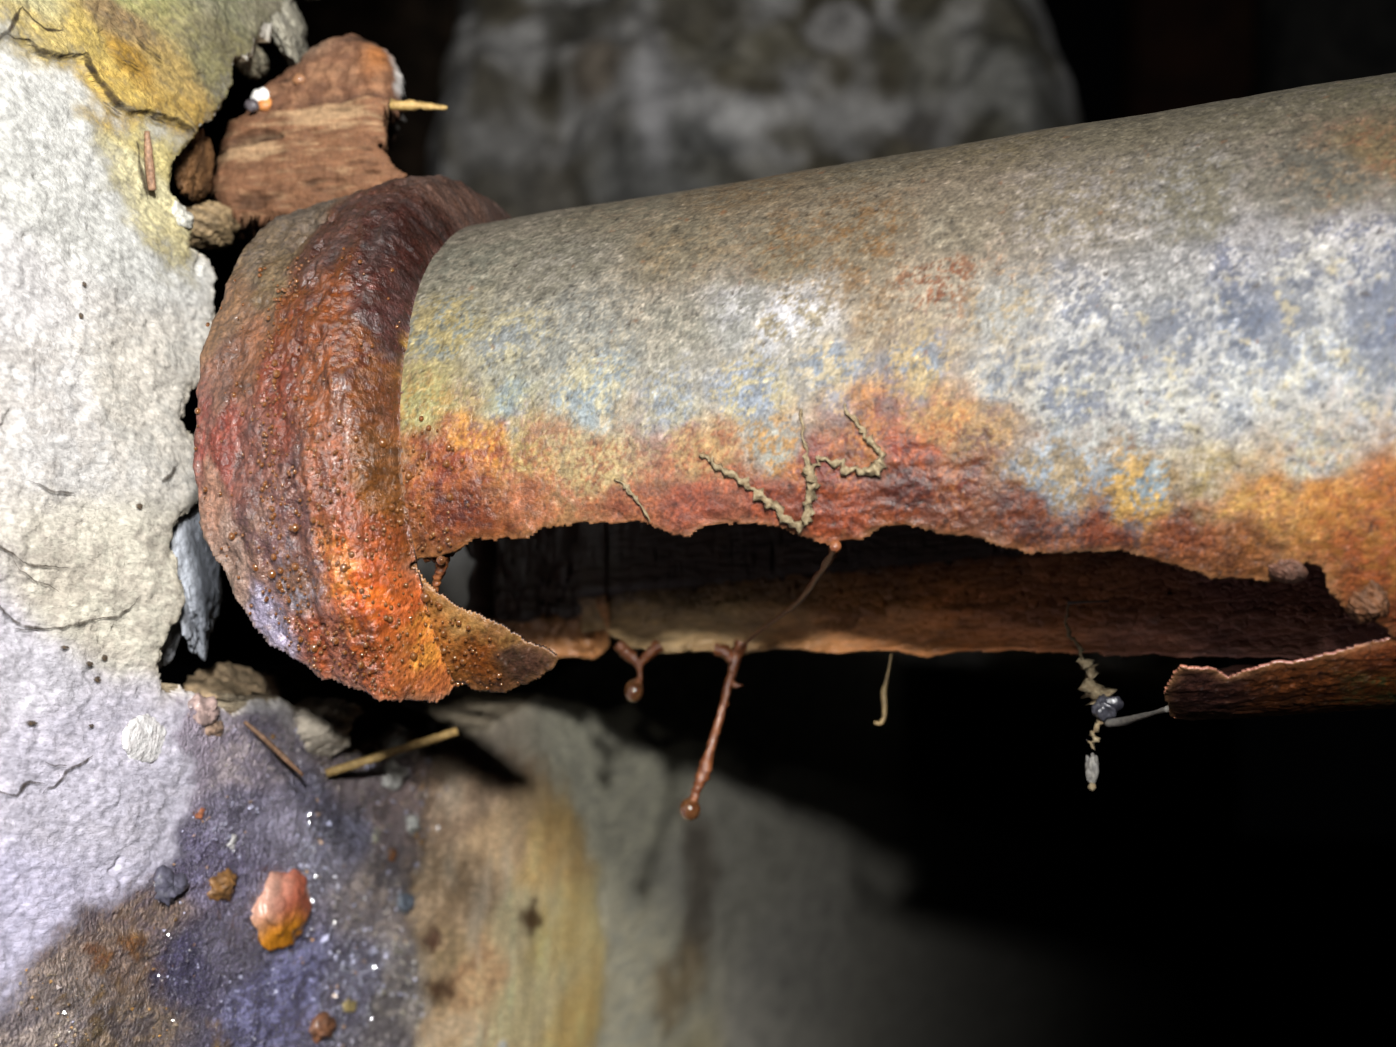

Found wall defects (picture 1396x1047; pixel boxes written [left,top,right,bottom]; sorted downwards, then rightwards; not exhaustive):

crack [0,6,199,198]
damp [0,0,288,265]
corrosion [423,548,462,592]
corrosion [614,639,664,702]
damp [0,708,605,1047]